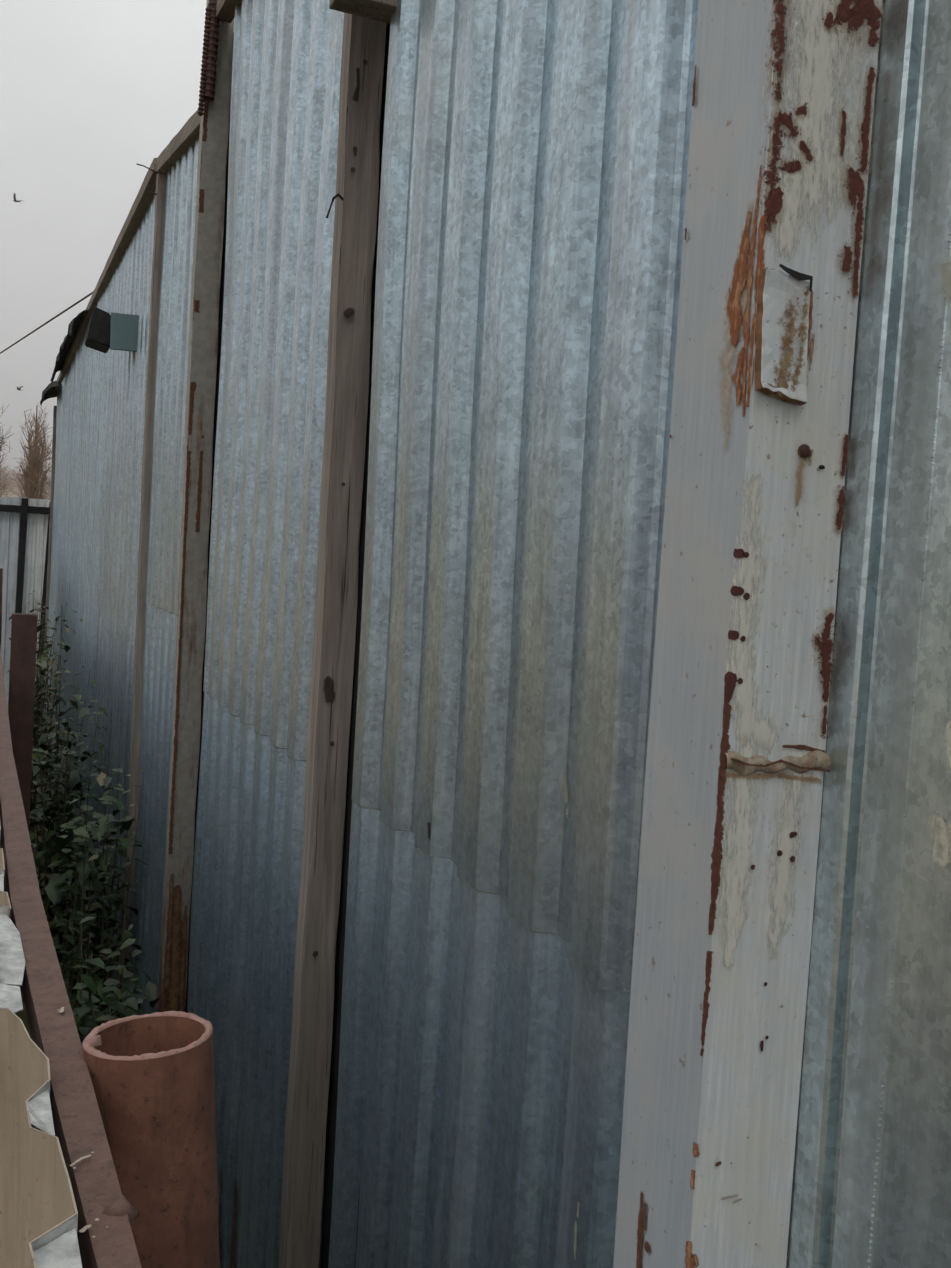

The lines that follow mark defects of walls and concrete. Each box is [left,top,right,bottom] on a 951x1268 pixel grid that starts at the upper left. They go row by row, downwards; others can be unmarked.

peeling [758,0,886,298]
rust [733,548,749,558]
rust [728,630,746,642]
rust [730,586,750,600]
peeling [726,475,776,757]
rust [708,671,743,935]
peeling [719,769,812,969]
rust [700,951,713,1056]
rust [690,1142,700,1189]
rust [636,1192,650,1268]
rust [685,1241,699,1268]